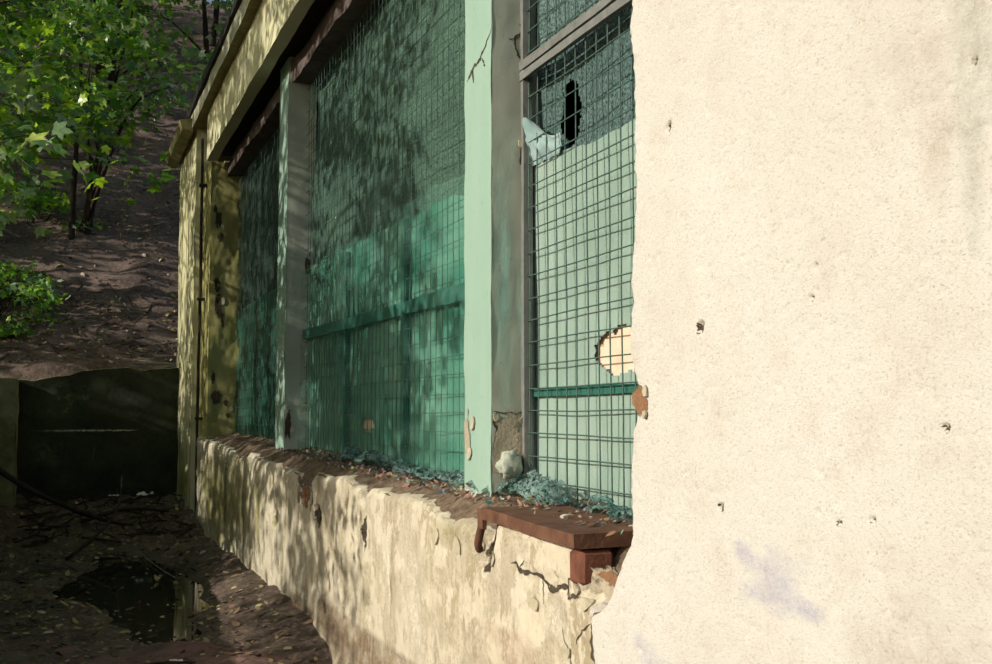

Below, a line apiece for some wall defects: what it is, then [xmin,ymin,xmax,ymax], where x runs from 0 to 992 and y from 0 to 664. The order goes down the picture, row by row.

crack [467,26,521,83]
peeling [214,277,225,328]
peeling [211,371,233,418]
peeling [285,404,295,439]
spalling [464,408,475,460]
spalling [492,410,523,480]
flaking render [632,385,648,419]
flaking render [297,485,322,527]
crack [510,560,600,664]